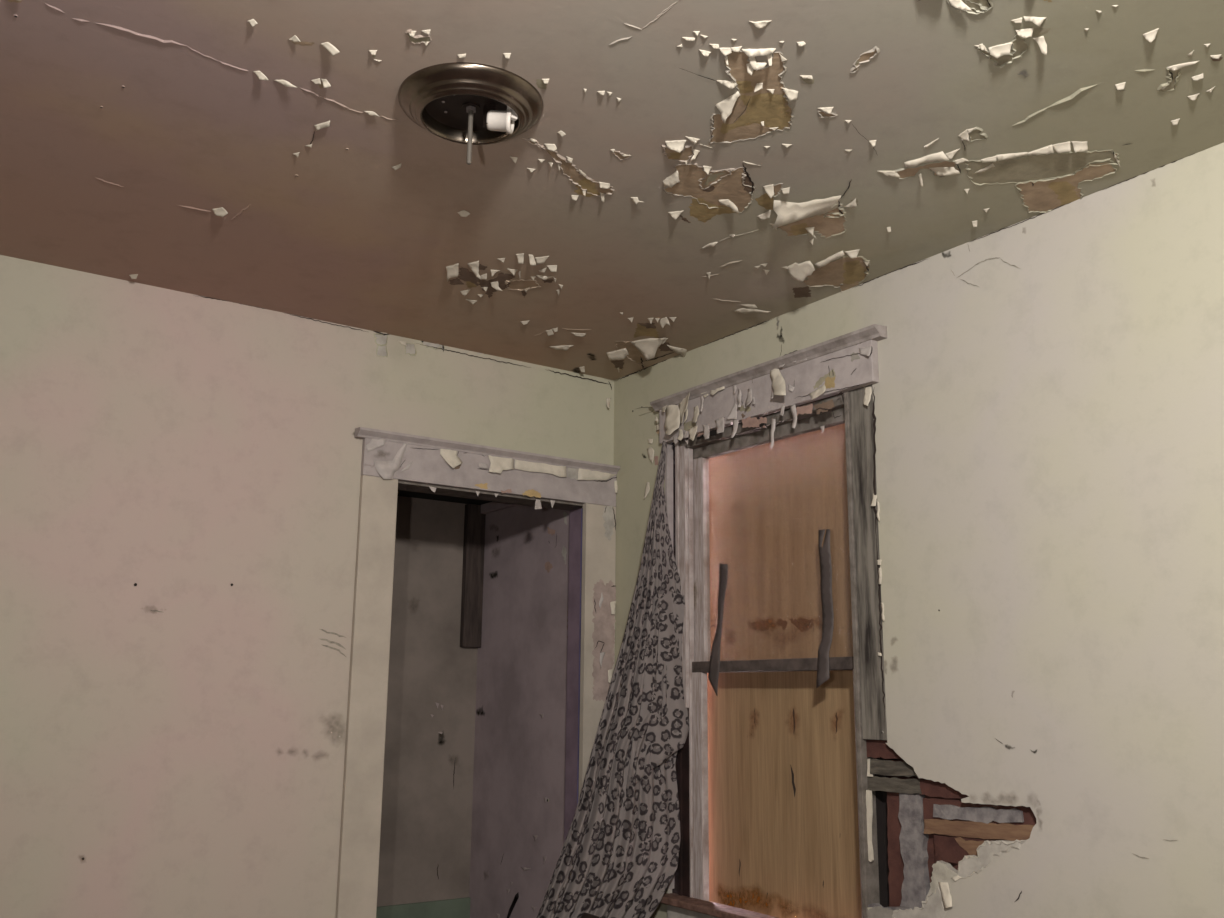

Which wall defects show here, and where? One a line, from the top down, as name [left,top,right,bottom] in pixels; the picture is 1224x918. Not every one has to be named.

crack [45,3,399,121]
peeling [946,0,994,14]
peeling [974,16,1051,68]
peeling [510,131,615,202]
peeling [610,149,631,160]
peeling [662,31,858,245]
peeling [878,127,1121,213]
peeling [446,253,563,304]
peeling [755,249,870,298]
peeling [606,317,687,408]
flaking render [866,739,1036,918]